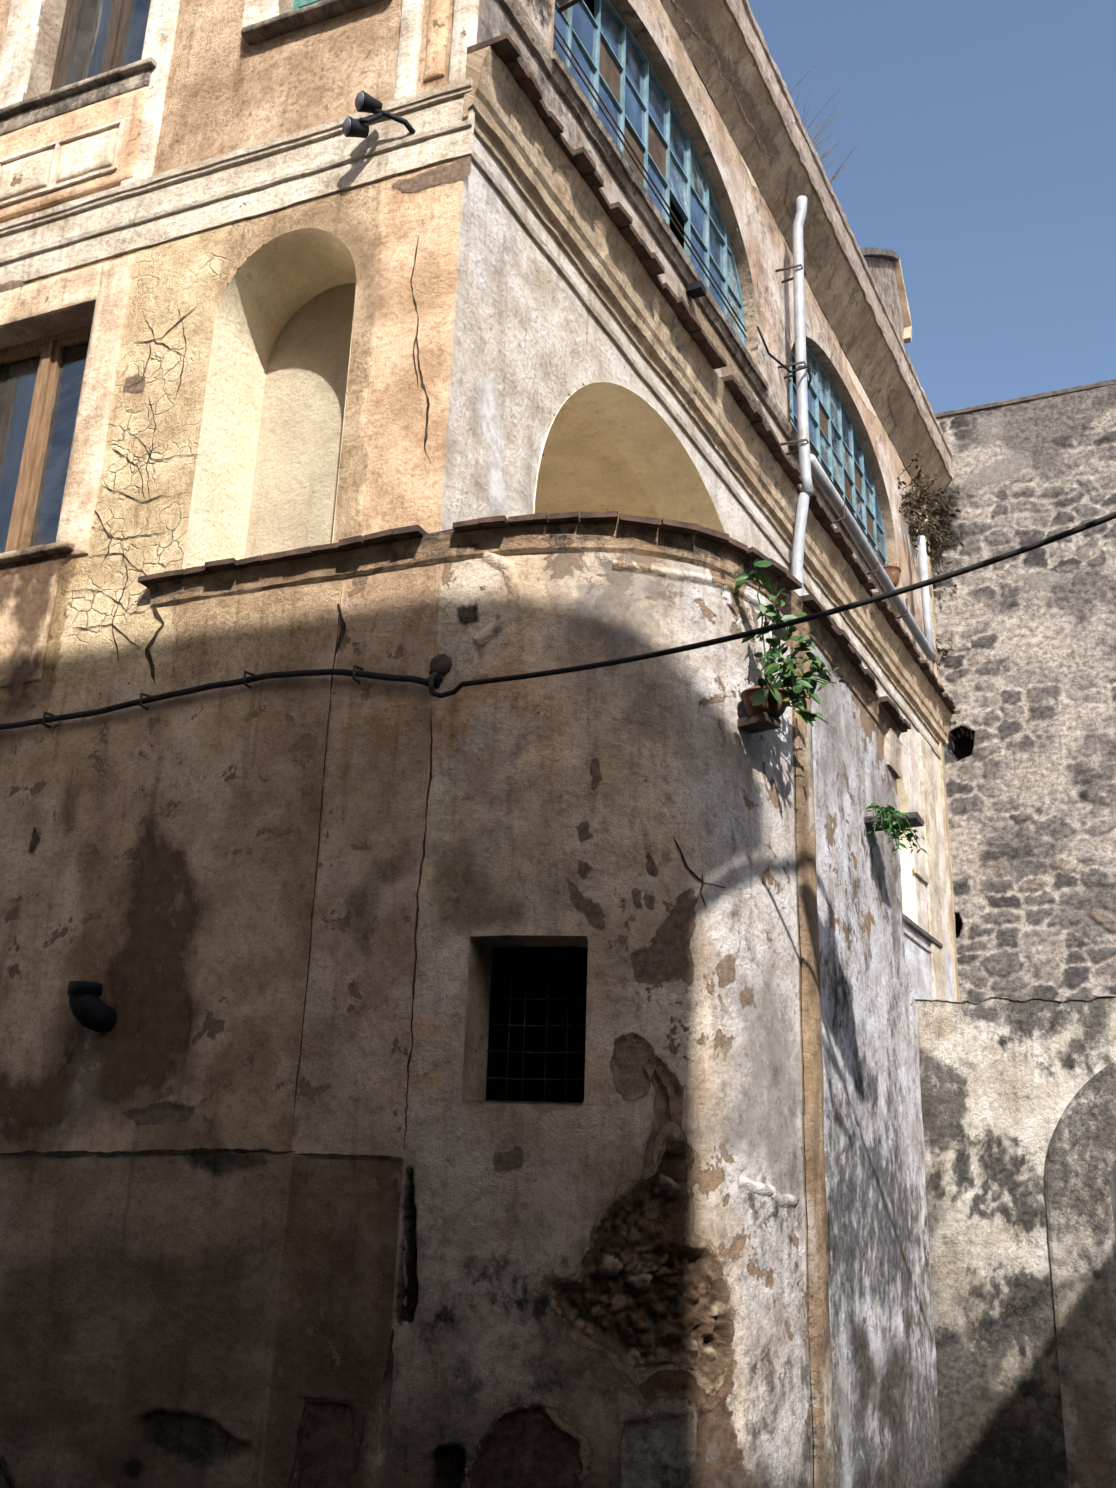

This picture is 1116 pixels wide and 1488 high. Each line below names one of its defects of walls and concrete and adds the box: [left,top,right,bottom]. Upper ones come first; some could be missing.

leakage [527,0,552,26]
crack [410,237,431,463]
crack [65,305,200,685]
peeling [646,852,658,877]
crack [673,837,727,907]
leakage [0,822,200,1144]
flaking render [630,888,697,986]
leakage [824,1041,878,1122]
flaking render [544,1032,746,1488]
leakage [831,1124,1048,1321]
leakage [965,1263,1049,1358]
flaking render [432,1403,594,1488]